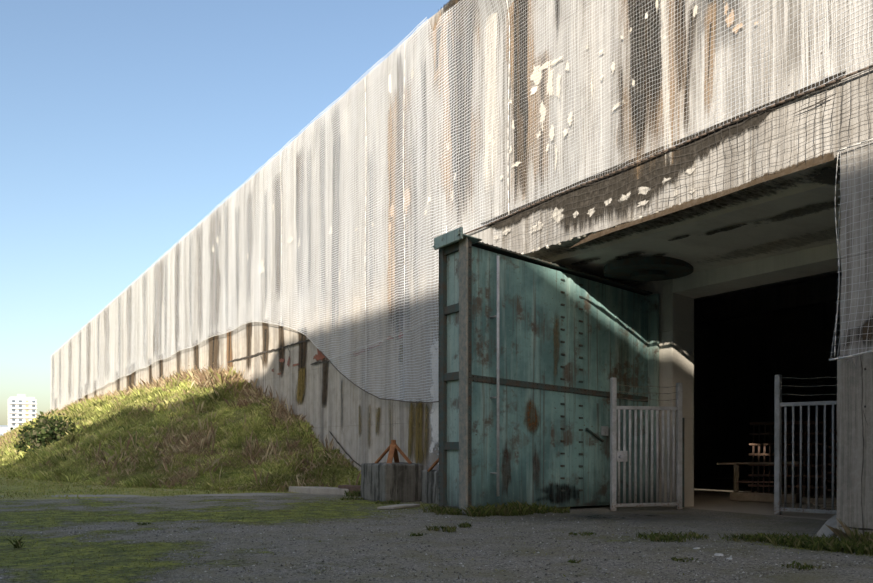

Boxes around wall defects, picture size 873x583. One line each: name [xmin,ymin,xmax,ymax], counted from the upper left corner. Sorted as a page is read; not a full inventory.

peeling [530,56,572,170]
damp [388,0,846,362]
damp [296,328,306,404]
damp [408,400,428,464]
rust [525,400,538,432]
crack [840,356,873,536]
rust [538,484,580,504]